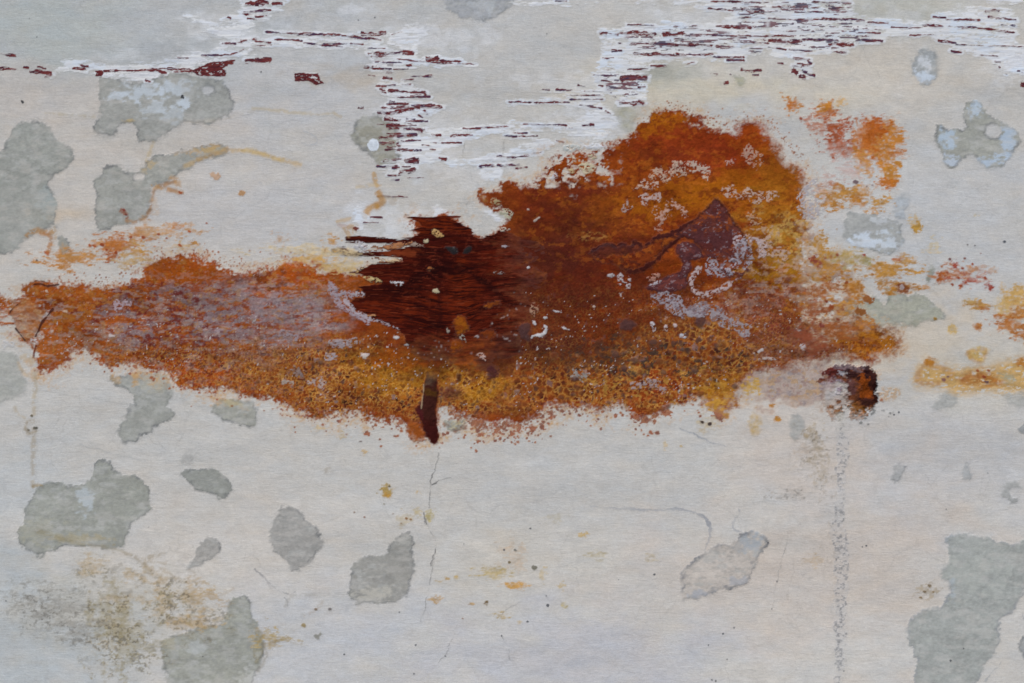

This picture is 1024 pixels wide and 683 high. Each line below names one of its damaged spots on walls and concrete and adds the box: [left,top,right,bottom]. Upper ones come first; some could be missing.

peeling [0,0,1024,235]
peeling [0,117,77,256]
rust [0,92,1024,456]
peeling [109,374,176,447]
peeling [15,458,153,559]
peeling [176,449,235,501]
peeling [159,594,265,683]
peeling [266,504,327,572]
peeling [346,530,417,613]
peeling [676,527,772,603]
peeling [903,531,1024,683]